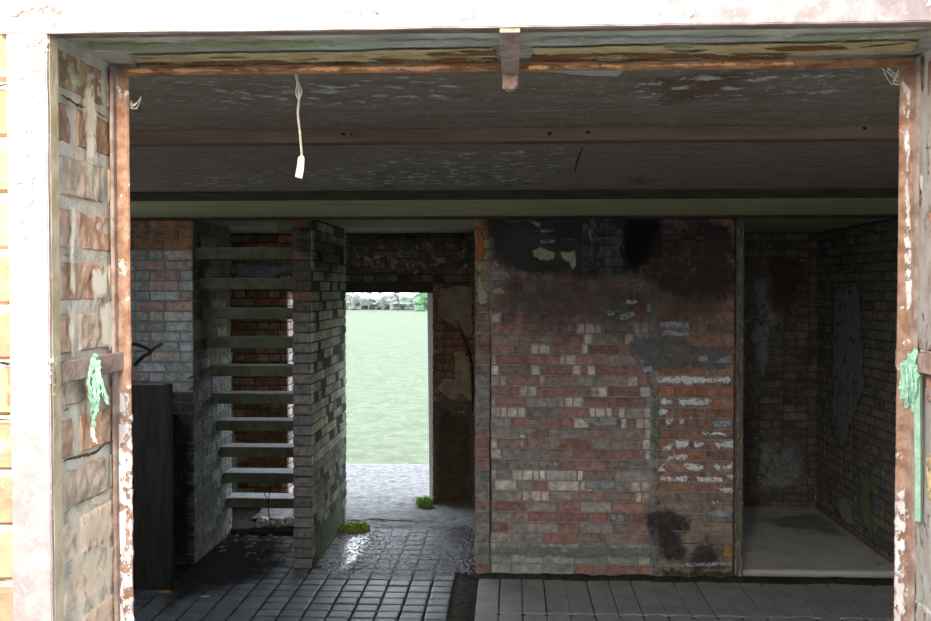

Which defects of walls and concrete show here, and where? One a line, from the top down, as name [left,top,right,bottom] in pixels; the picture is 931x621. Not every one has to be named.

peeling [532,221,576,269]
flaking render [902,73,931,351]
flaking render [436,285,474,414]
peeling [659,321,690,337]
peeling [658,397,712,427]
peeling [642,366,731,385]
peeling [119,393,134,621]
damp [647,509,732,572]
peeling [658,420,734,504]
flaking render [894,387,931,621]